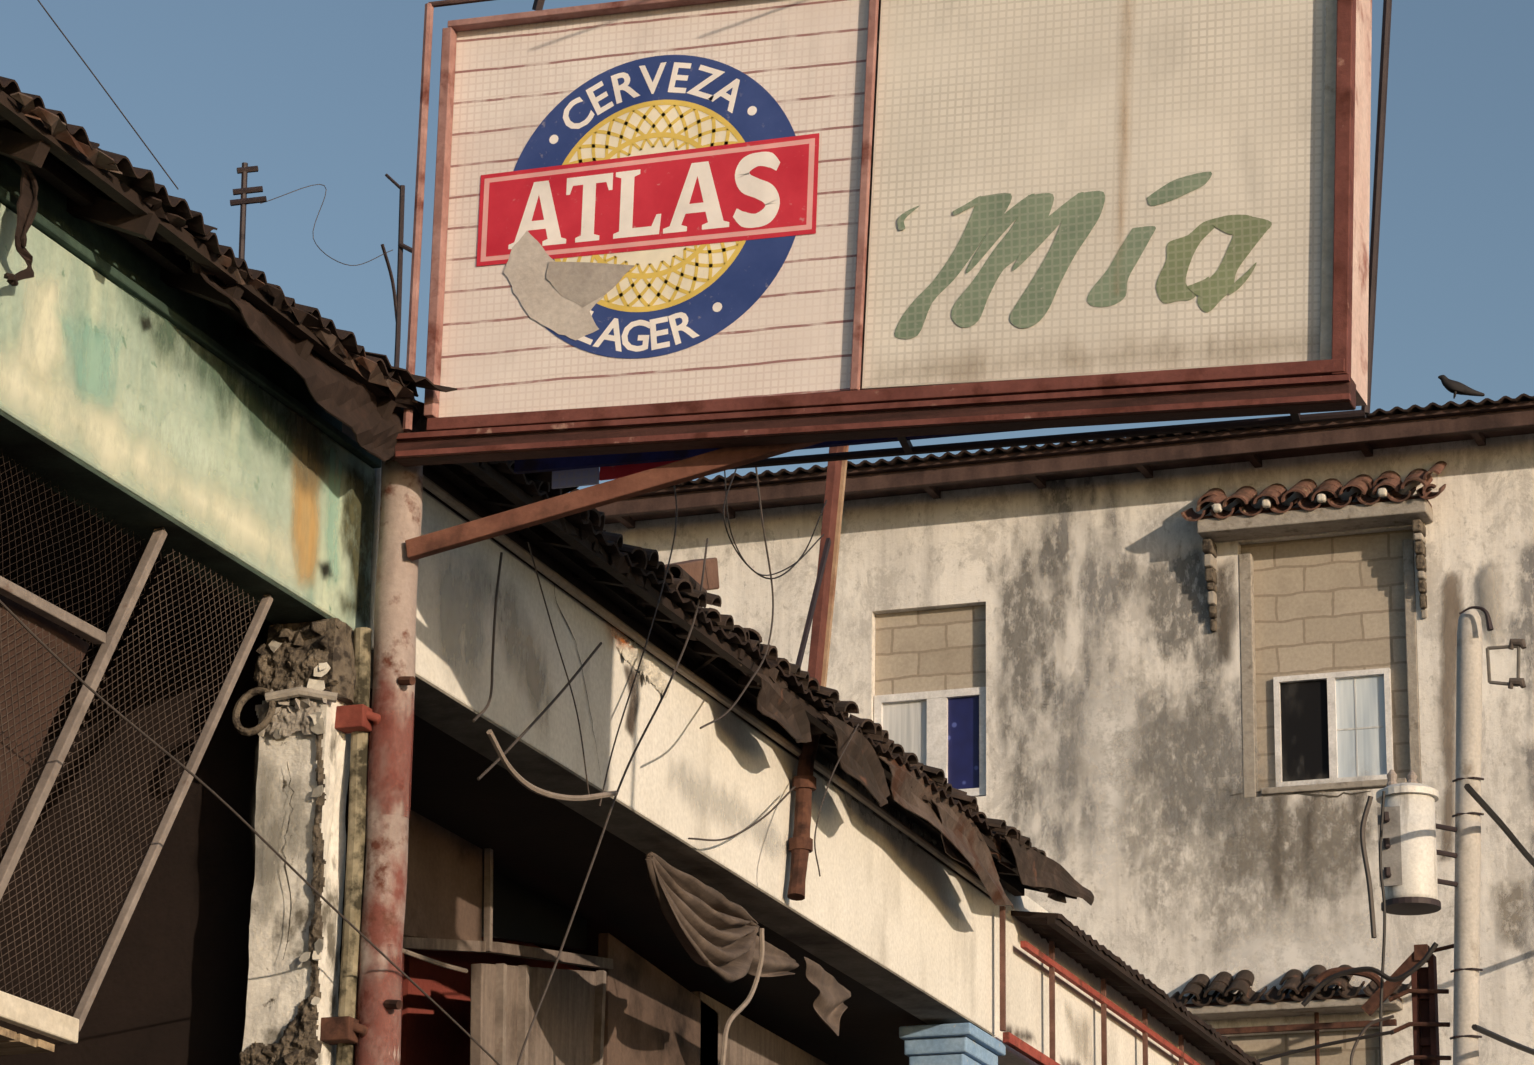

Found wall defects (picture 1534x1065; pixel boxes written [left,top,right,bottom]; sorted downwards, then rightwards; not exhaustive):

damp [1000,477,1369,893]
damp [1511,546,1534,687]
damp [1526,749,1534,793]
spalling [239,639,331,1065]
damp [1499,880,1534,942]